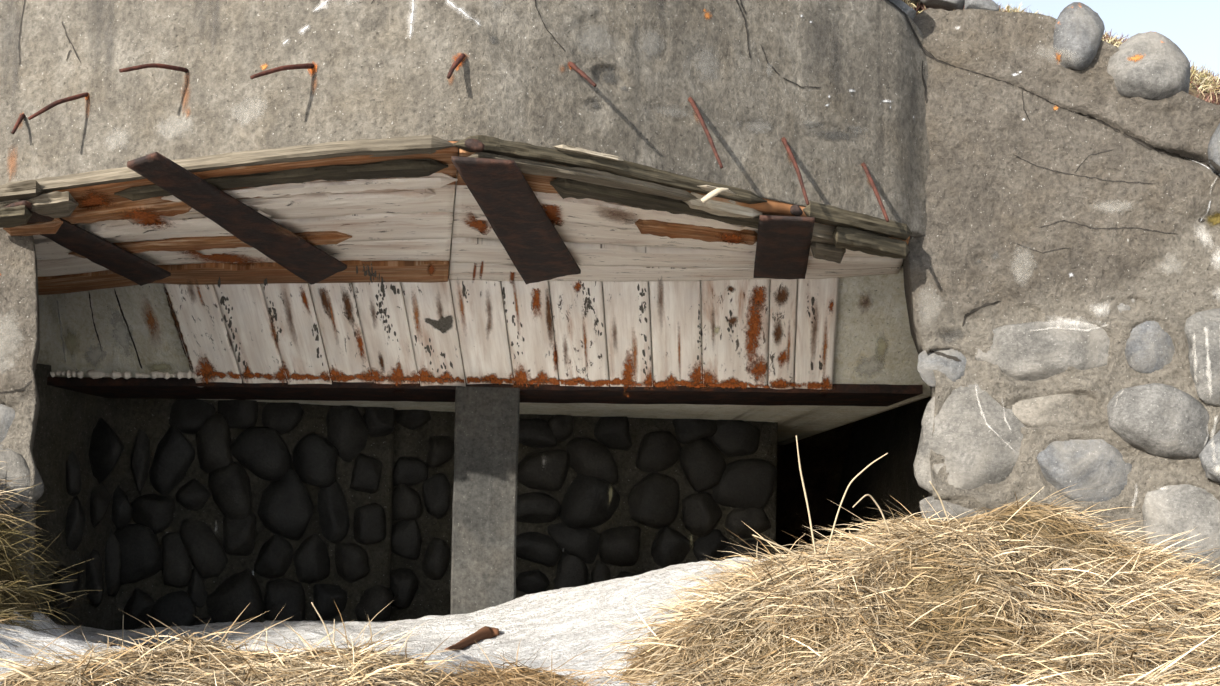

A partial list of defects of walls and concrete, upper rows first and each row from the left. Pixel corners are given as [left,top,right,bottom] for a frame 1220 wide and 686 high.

crack [736,0,821,88]
crack [888,0,1220,184]
rust [75,189,171,228]
rust [465,214,491,235]
rust [541,204,562,226]
crack [1015,220,1176,253]
peeling [356,263,405,341]
peeling [414,328,453,374]
rust [164,285,832,396]
peeling [580,281,603,336]
peeling [637,284,651,375]
peeling [697,304,736,360]